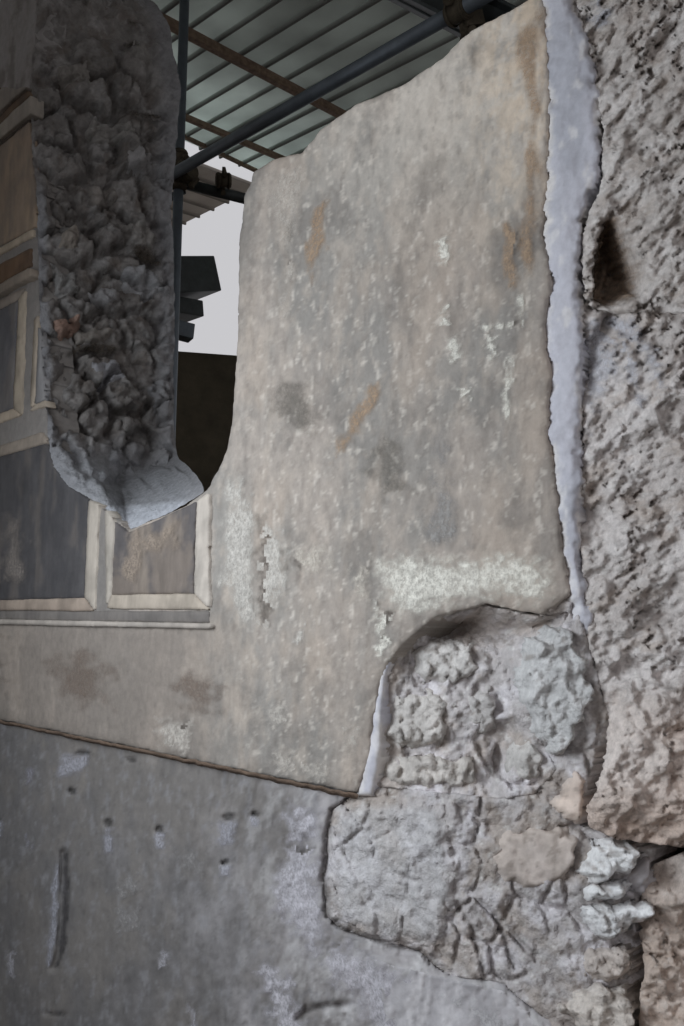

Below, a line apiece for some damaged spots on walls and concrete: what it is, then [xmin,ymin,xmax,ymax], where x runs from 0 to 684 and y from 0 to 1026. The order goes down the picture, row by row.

water stain [374,602,391,656]
water stain [355,555,547,612]
spalling [377,605,594,798]
spalling [0,720,455,947]